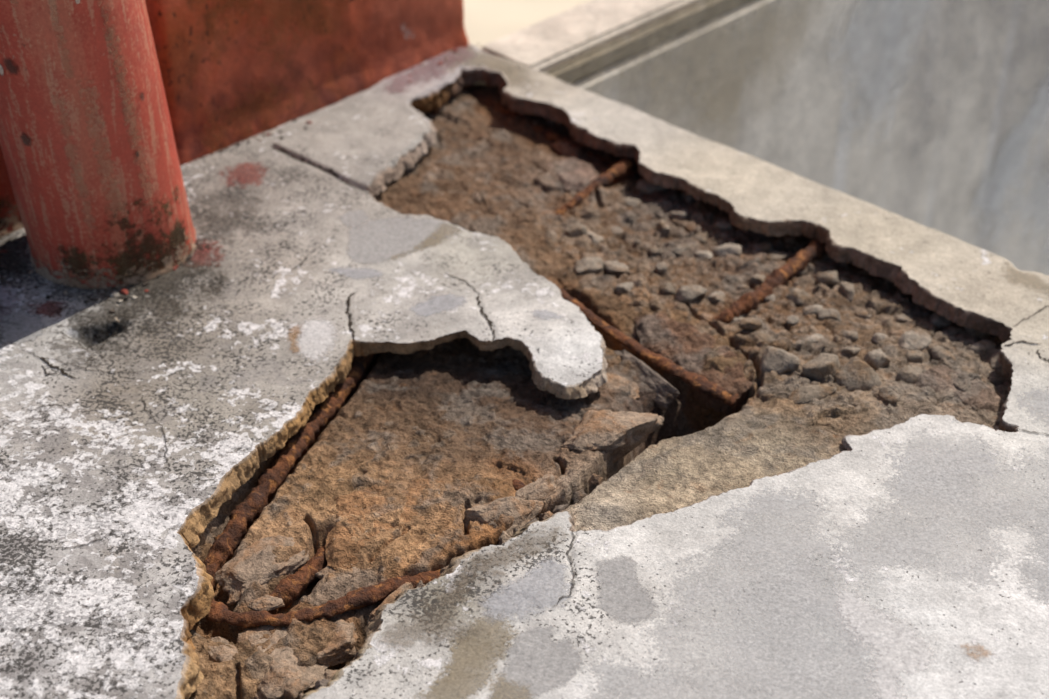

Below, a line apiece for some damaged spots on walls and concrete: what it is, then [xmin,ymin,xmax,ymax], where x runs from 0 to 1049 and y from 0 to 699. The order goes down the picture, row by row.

crack [270,146,365,191]
corrosion [427,85,644,216]
crack [345,292,357,342]
crack [446,273,496,340]
spalling [189,83,1011,699]
corrosion [557,286,739,407]
corrosion [713,239,827,324]
crack [1005,306,1049,361]
corrosion [203,353,441,628]
leakage [420,556,672,699]
leakage [673,487,931,699]